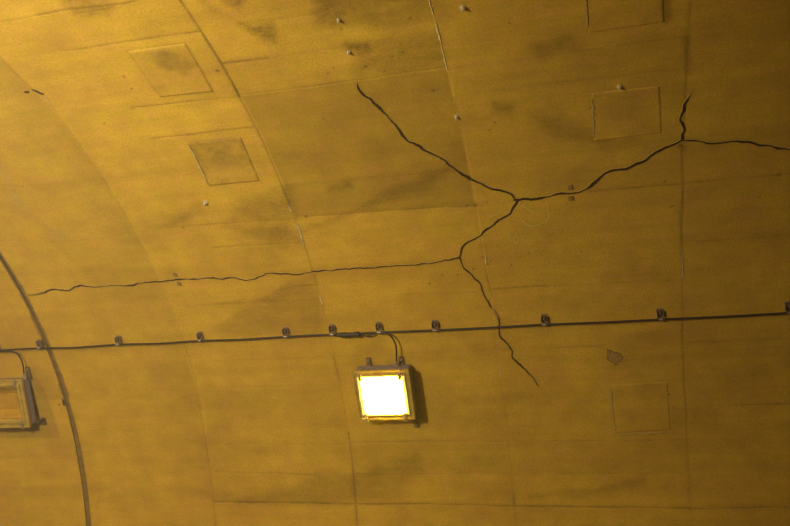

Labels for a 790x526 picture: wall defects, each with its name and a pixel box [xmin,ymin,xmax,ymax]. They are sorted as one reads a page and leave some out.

crack [26,82,790,388]